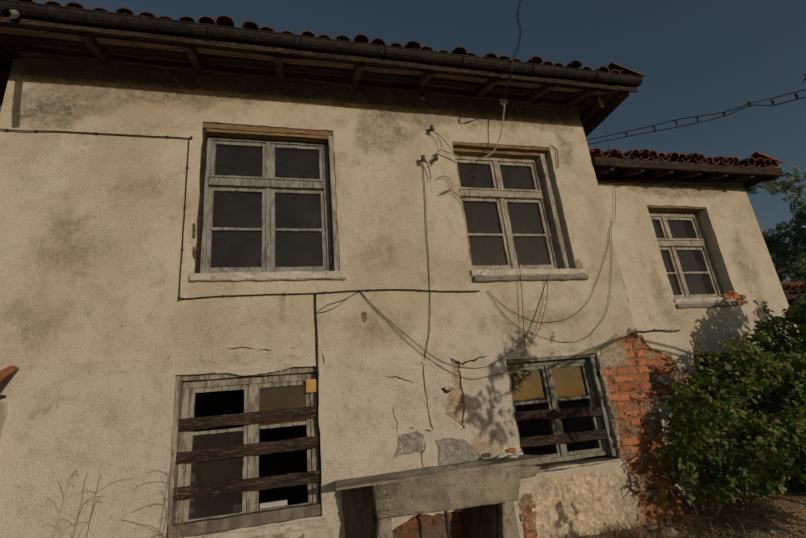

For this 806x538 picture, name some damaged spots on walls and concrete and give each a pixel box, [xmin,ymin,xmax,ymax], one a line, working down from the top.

spalling [442,359,467,431]
spalling [518,328,708,538]